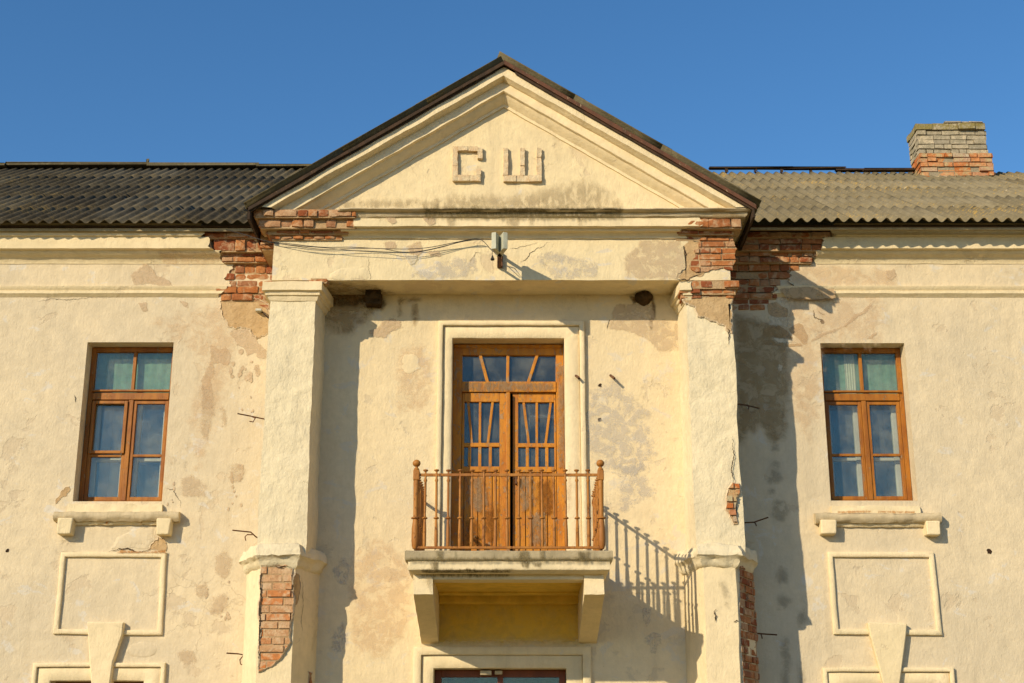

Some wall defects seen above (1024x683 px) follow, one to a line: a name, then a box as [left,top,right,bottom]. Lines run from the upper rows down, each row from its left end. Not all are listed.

water stain [425,206,621,219]
spalling [202,209,357,438]
spalling [626,218,872,347]
flaking render [725,482,741,525]
peeling [197,585,231,620]
flaking render [257,565,301,673]
flaking render [738,566,760,683]